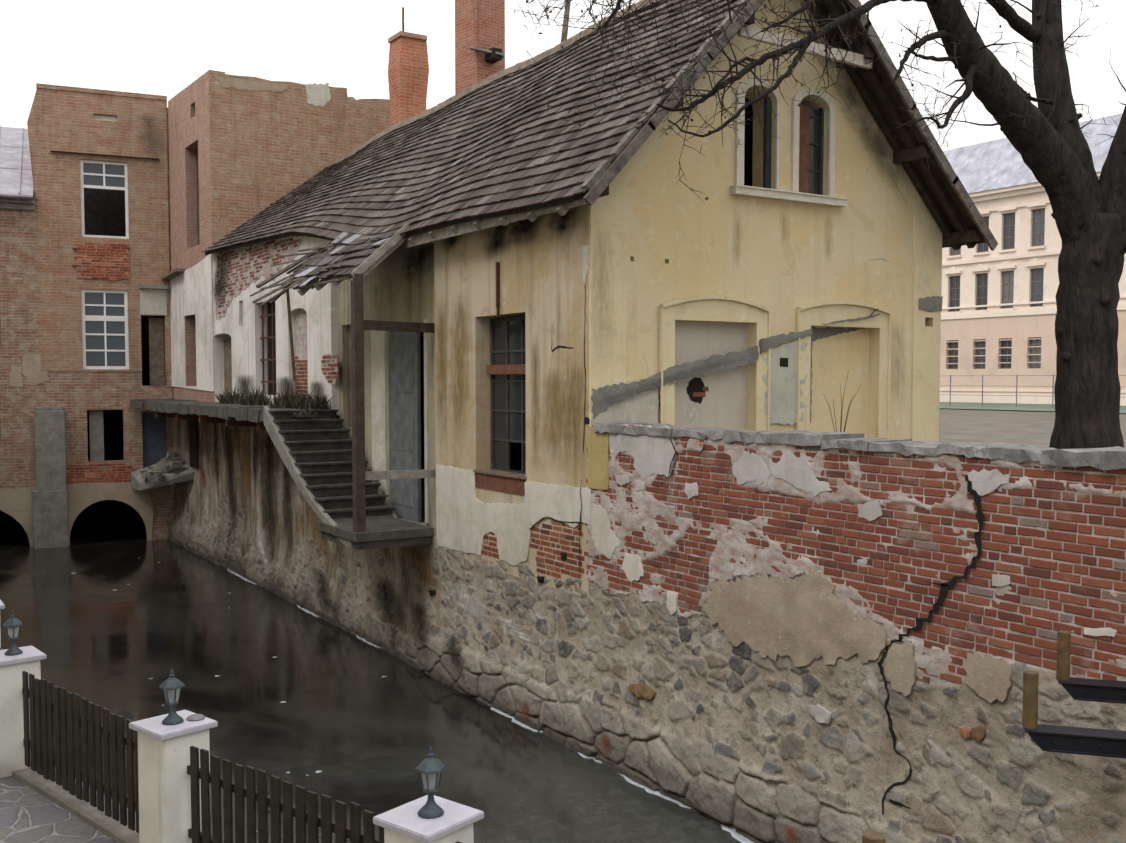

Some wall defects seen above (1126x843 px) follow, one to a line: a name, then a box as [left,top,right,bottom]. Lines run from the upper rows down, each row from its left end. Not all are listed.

flaking render [214,237,302,320]
damp [214,424,235,520]
damp [252,427,291,563]
damp [439,308,465,413]
damp [533,349,580,445]
flaking render [584,388,677,491]
spalling [687,377,709,404]
flaking render [968,469,1010,496]
flaking render [530,504,645,583]
damp [447,636,461,667]
flaking render [703,570,916,697]
crack [877,475,984,815]